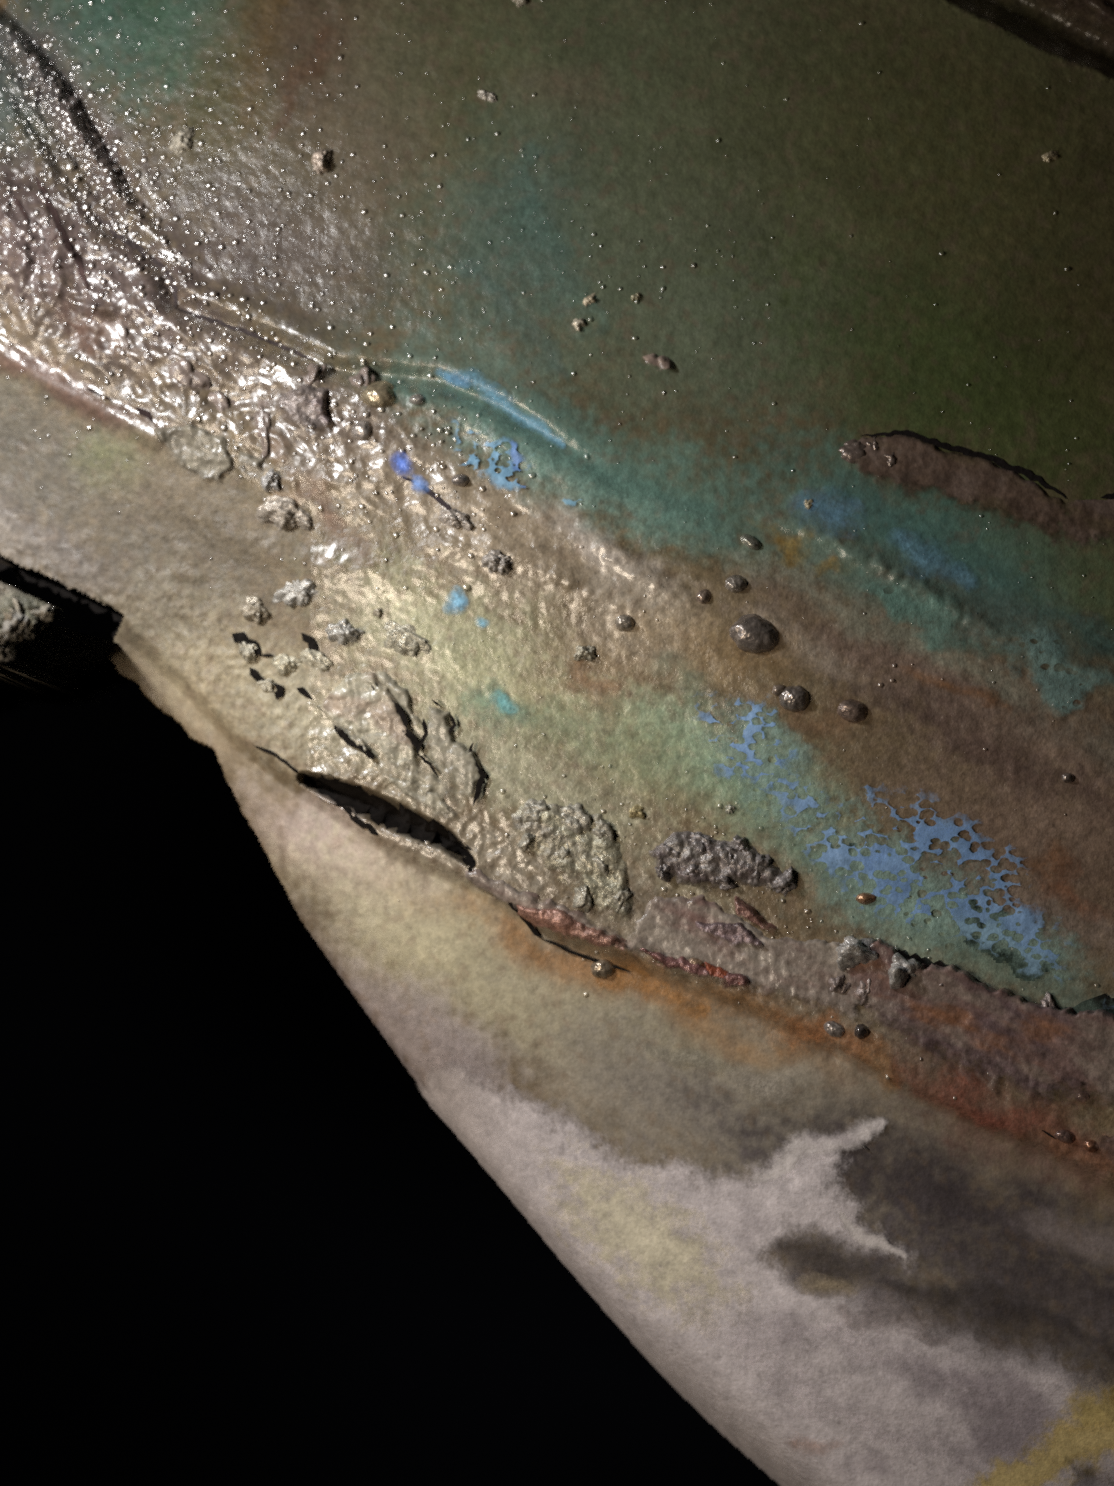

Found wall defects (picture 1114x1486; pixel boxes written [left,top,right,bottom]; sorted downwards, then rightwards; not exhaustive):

spalling [0,578,135,720]
peeling [344,731,371,751]
crack [255,682,487,884]
peeling [377,671,482,795]
crack [508,903,629,972]
damp [419,1062,1114,1486]